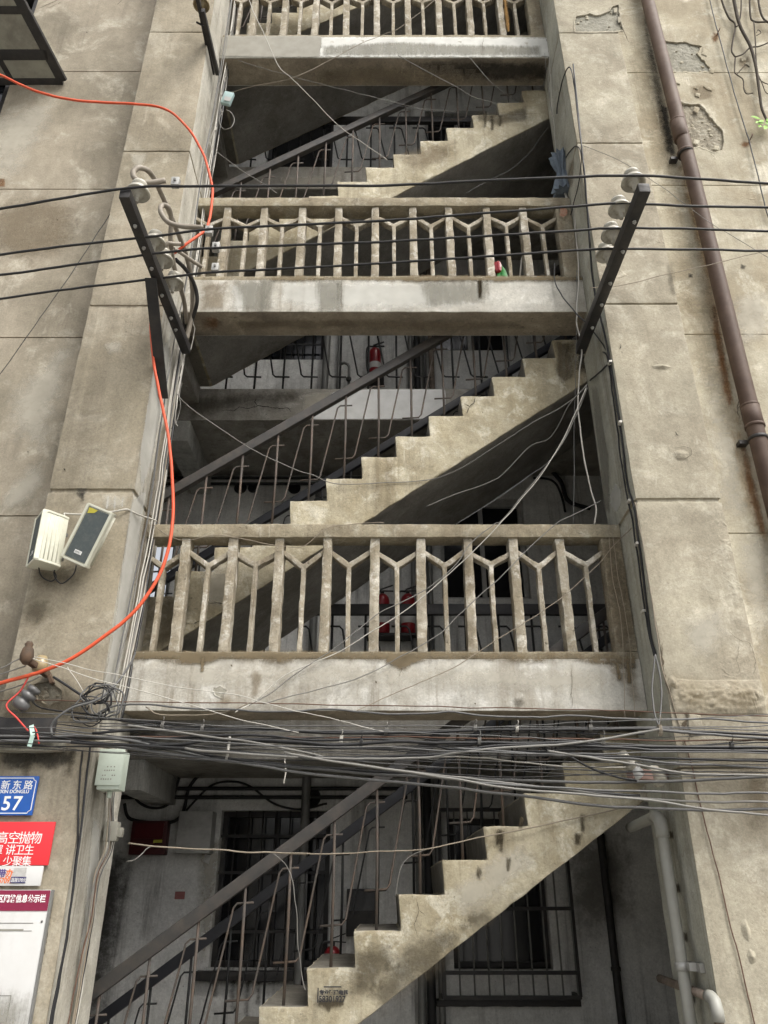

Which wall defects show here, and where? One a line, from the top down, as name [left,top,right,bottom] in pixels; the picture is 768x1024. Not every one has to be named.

flaking render [573,4,624,33]
flaking render [665,40,715,85]
flaking render [681,86,726,153]